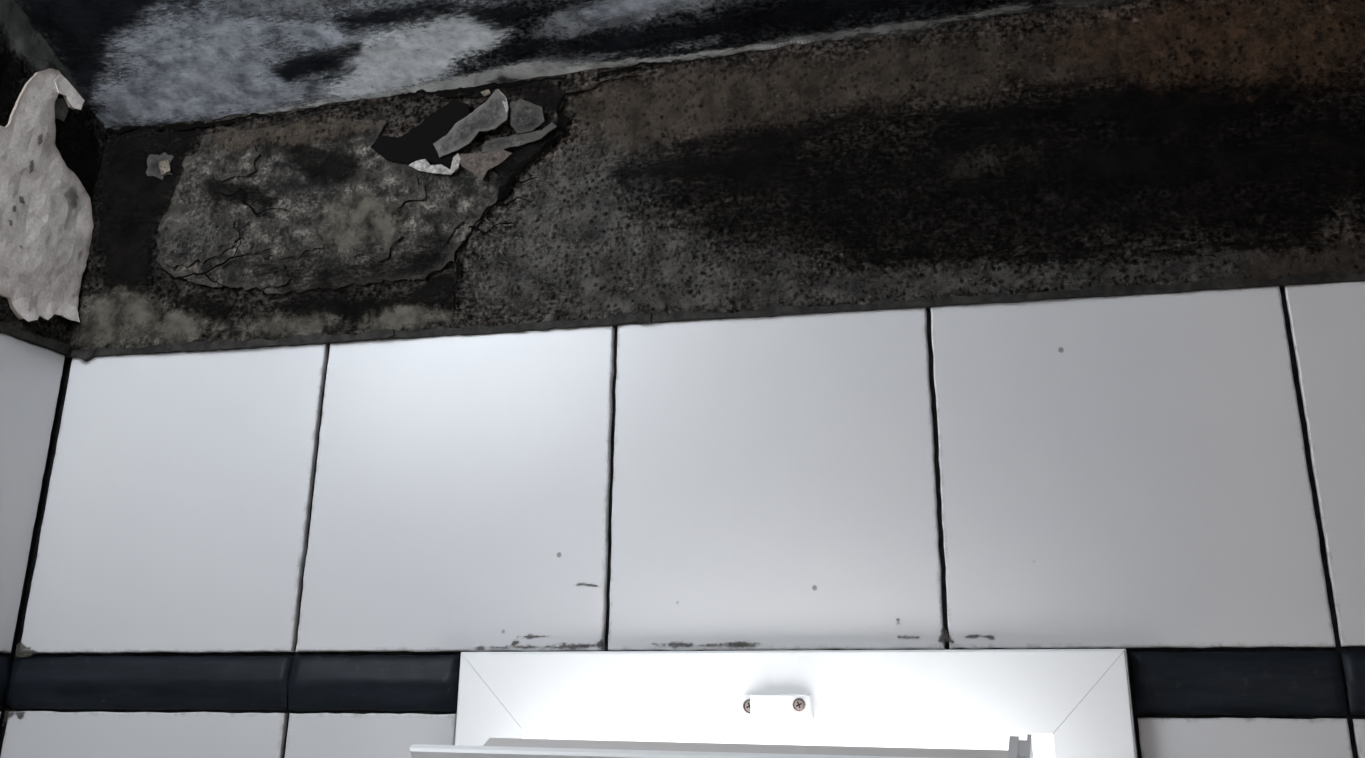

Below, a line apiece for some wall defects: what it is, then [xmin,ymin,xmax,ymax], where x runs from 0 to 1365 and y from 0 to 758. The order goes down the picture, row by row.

peeling [0,68,94,323]
flaking render [146,76,562,301]
damp [0,0,1365,349]